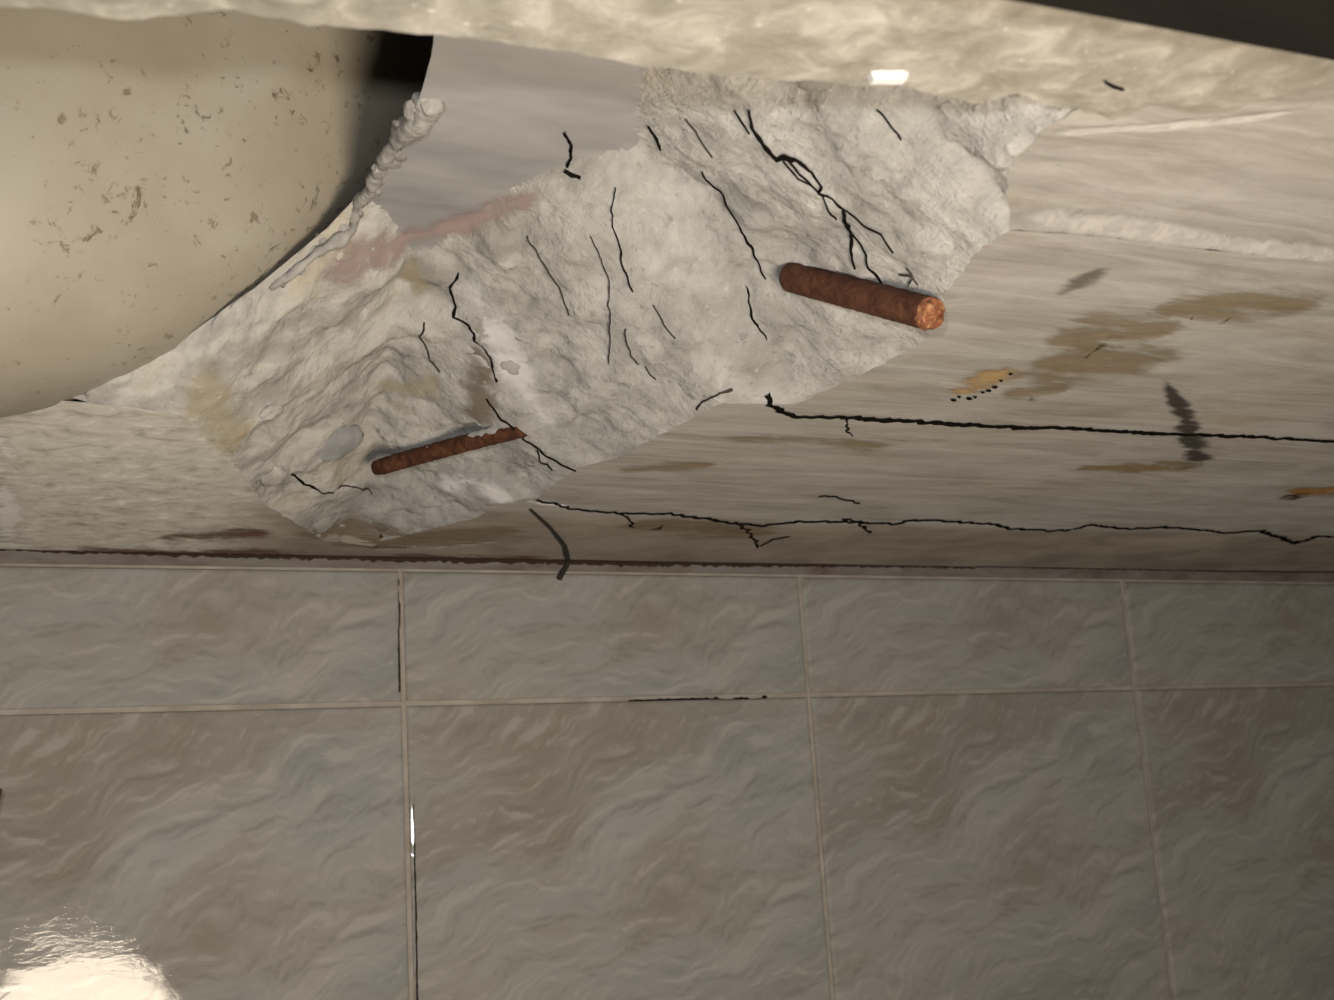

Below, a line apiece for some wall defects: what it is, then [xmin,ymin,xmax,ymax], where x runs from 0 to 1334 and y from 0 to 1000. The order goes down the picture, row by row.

crack [291,473,372,495]
crack [527,236,570,316]
crack [590,188,675,380]
spalling [73,35,1334,542]
crack [685,119,767,340]
crack [733,109,918,287]
crack [419,273,1334,549]
water stain [951,294,1314,402]
water stain [1079,462,1194,472]